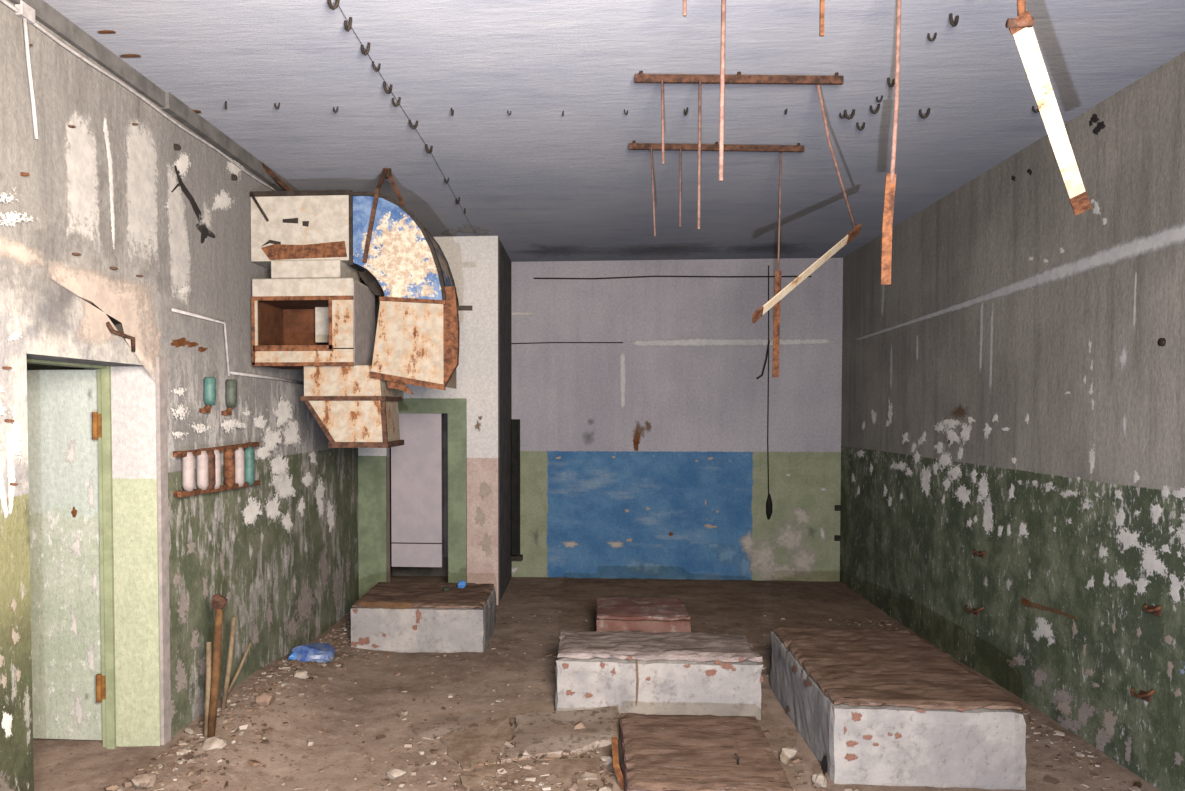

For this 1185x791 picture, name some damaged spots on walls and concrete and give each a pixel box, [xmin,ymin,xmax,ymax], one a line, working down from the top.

peeling [0,187,38,226]
peeling [0,385,23,517]
peeling [169,386,351,644]
corrosion [633,422,651,451]
peeling [890,413,1029,540]
peeling [1008,444,1101,532]
peeling [1085,471,1185,608]
peeling [2,706,14,737]
peeling [0,655,21,688]
peeling [171,573,206,723]
spalling [844,712,902,761]
peeling [1006,617,1132,765]